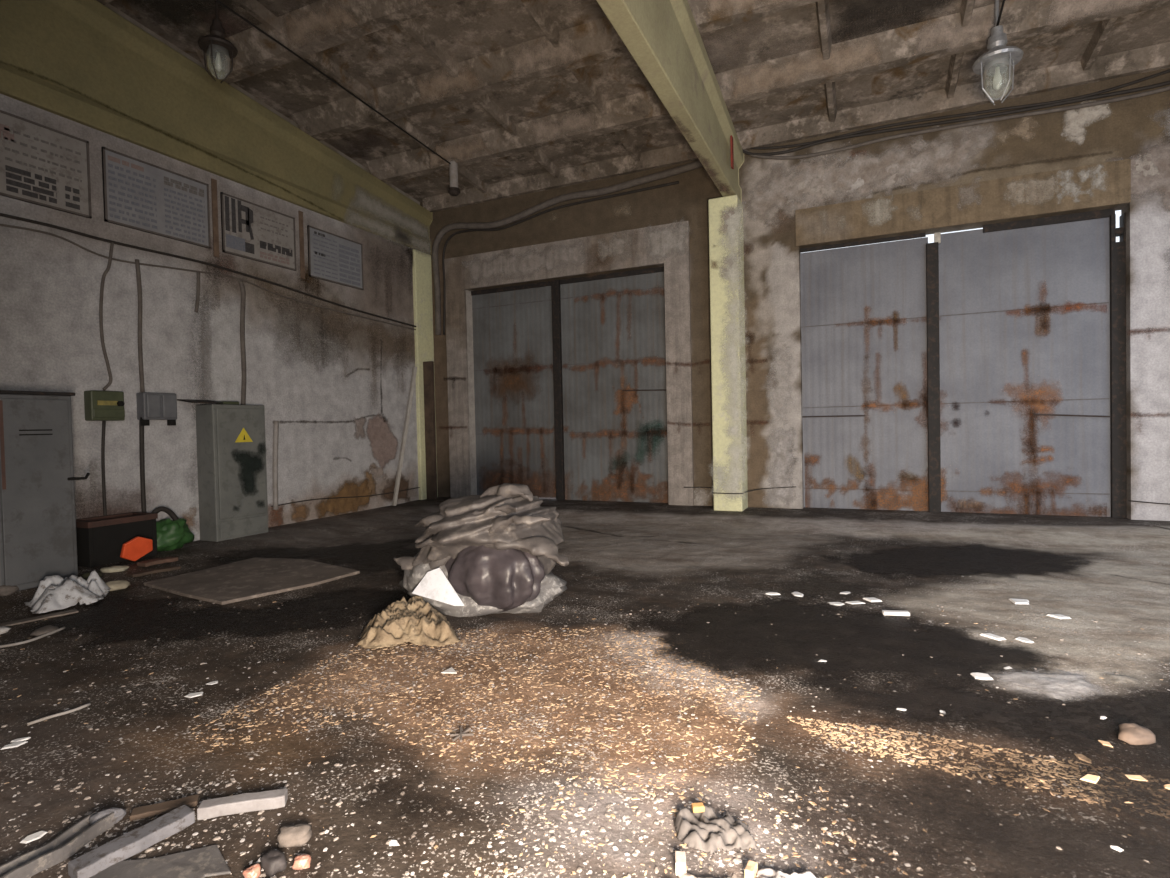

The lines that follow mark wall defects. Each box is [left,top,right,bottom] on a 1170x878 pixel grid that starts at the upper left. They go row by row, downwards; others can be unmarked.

rust [865,308,902,349]
rust [1008,289,1106,335]
rust [483,290,709,503]
rust [863,368,959,427]
rust [995,350,1058,466]
flaking render [268,415,410,528]
rust [804,442,1106,516]